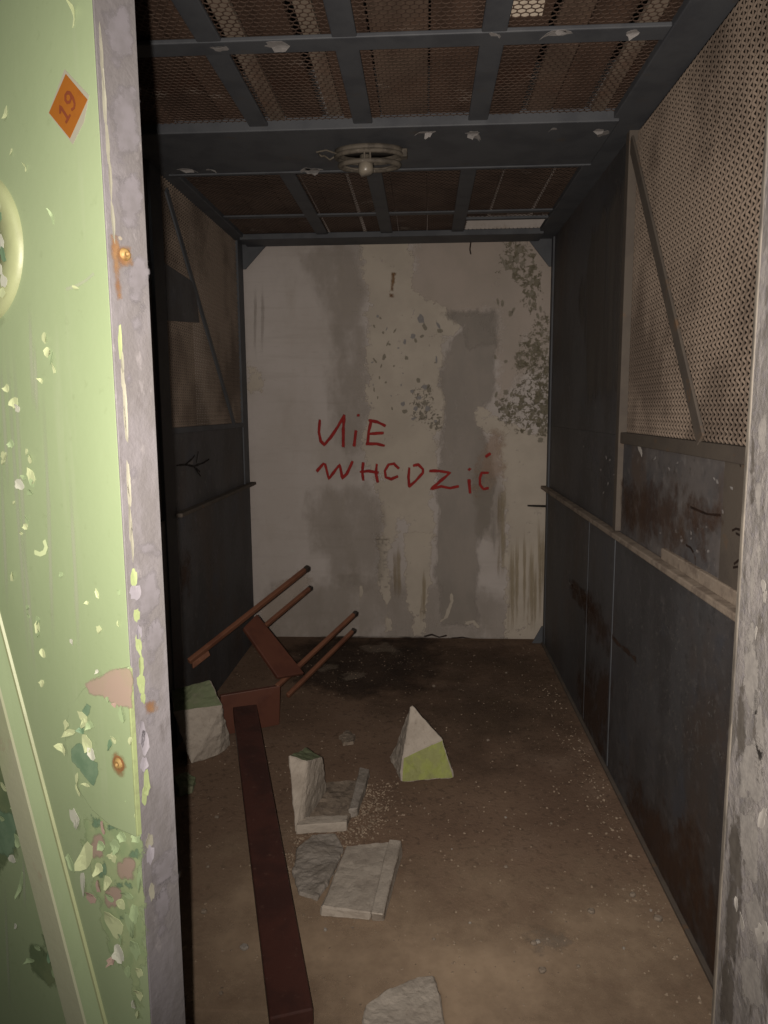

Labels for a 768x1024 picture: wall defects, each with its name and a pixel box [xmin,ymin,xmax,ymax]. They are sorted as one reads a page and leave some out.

peeling [99,6,143,242]
peeling [2,384,20,412]
peeling [0,439,35,504]
peeling [36,332,56,384]
corrosion [112,239,131,298]
peeling [118,257,149,442]
damp [401,241,550,628]
peeling [65,808,178,1019]